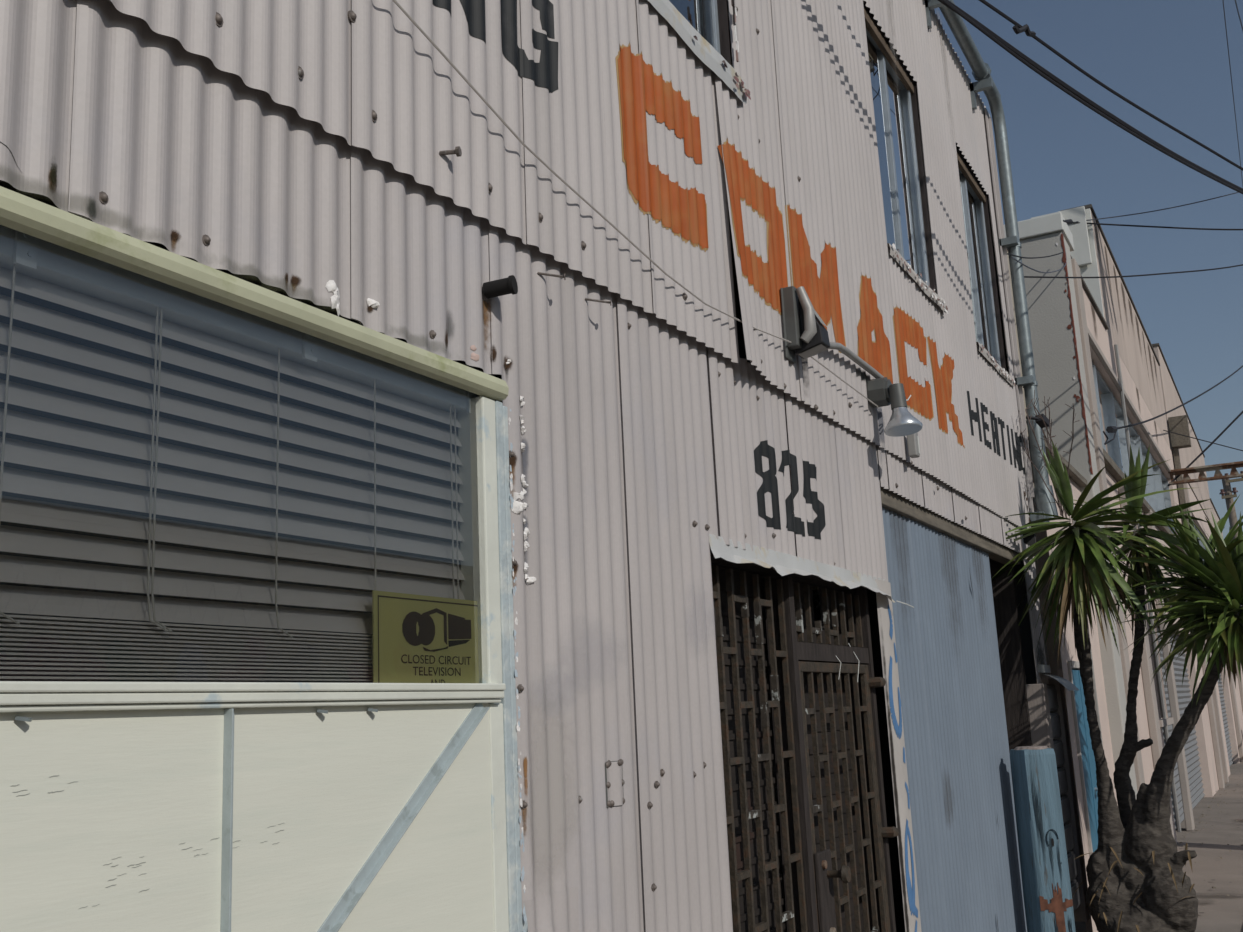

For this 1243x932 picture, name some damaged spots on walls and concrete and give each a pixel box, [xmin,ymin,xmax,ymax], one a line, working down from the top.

corrosion [49,164,57,188]
peeling [509,396,536,595]
peeling [518,752,528,932]